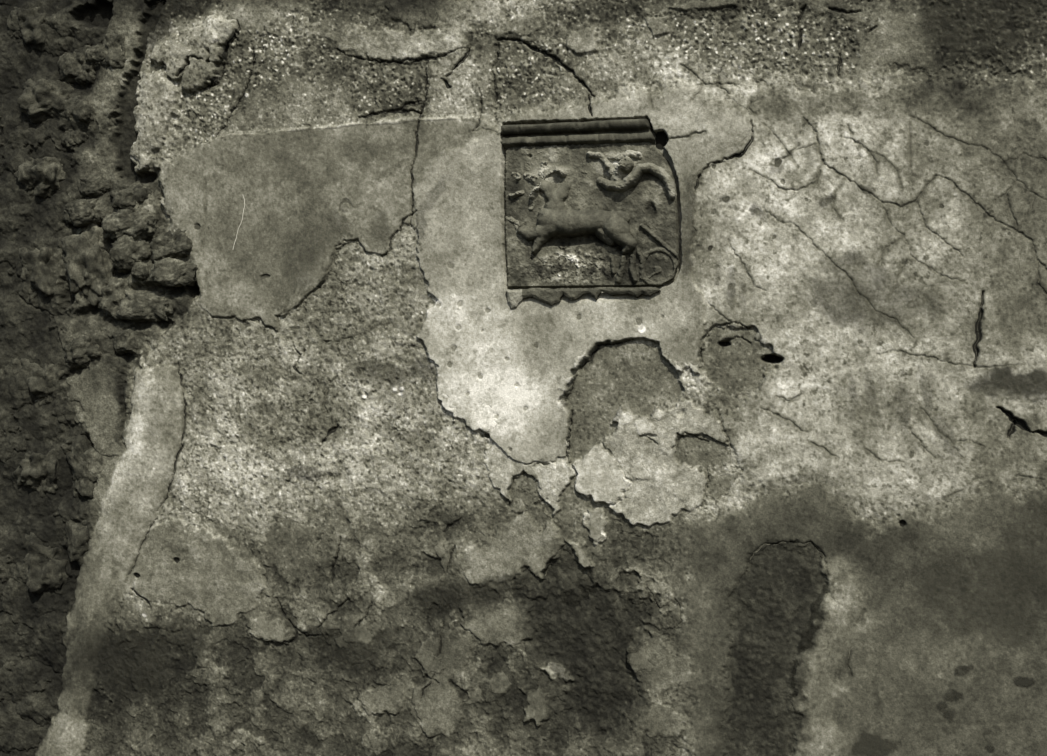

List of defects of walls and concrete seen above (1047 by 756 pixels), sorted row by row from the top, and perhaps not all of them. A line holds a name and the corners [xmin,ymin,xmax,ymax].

crack [473,39,594,131]
crack [338,49,470,255]
crack [680,64,1047,371]
peeling [437,394,499,433]
spalling [509,327,783,543]
crack [764,394,834,456]
crack [999,407,1047,437]
peeling [252,612,290,642]
peeling [465,671,512,704]
peeling [523,688,550,725]
spalling [528,544,656,740]
spalling [719,541,829,756]